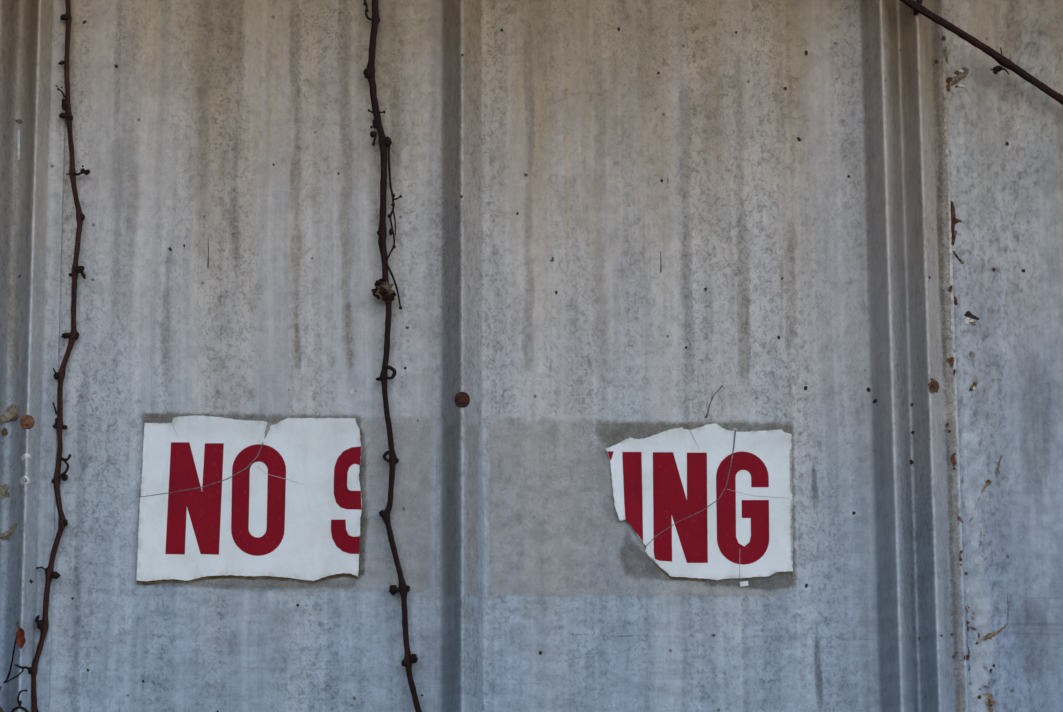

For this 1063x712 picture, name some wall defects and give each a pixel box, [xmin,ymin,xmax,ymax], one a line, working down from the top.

rust [928,378,940,394]
rust [952,603,995,712]